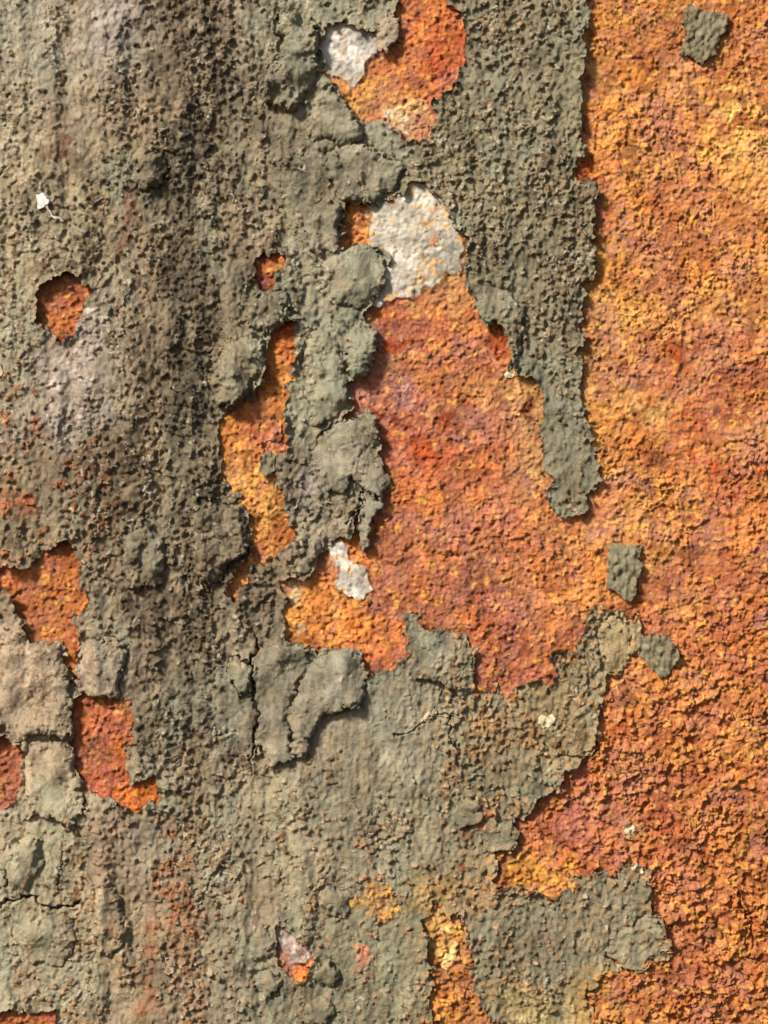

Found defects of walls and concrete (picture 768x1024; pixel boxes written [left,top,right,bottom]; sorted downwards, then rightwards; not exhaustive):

rust [727,103,746,164]
rust [568,157,594,175]
peeling [34,271,94,343]
rust [376,337,412,354]
rust [485,326,507,357]
peeling [216,320,298,603]
rust [372,409,440,463]
rust [521,396,535,421]
peeling [251,0,768,1024]
peeling [0,540,161,832]